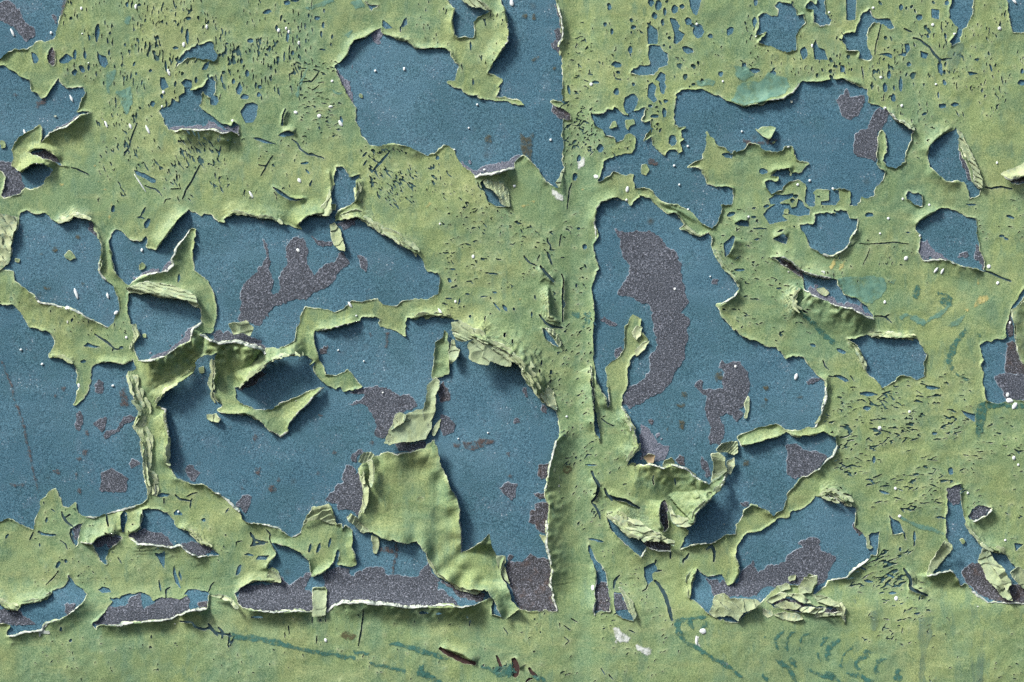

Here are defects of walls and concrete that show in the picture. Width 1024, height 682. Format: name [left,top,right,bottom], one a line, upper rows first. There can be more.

peeling [906,127,986,276]
peeling [0,0,581,642]
peeling [577,0,959,622]
peeling [979,290,1024,404]
peeling [925,467,1024,607]